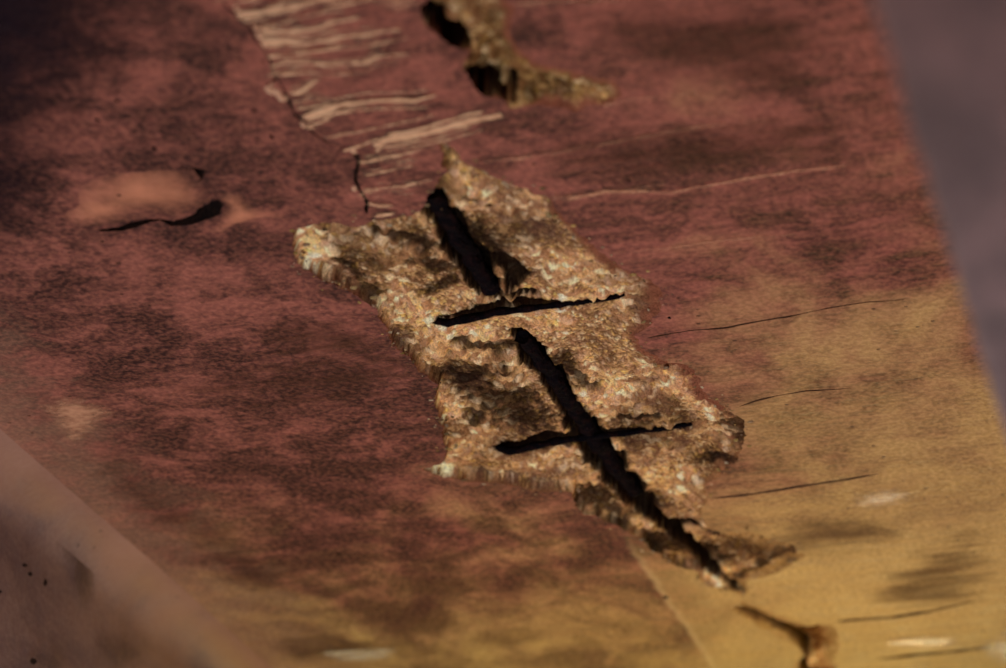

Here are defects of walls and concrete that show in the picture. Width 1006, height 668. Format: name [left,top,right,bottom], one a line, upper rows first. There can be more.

spalling [420,0,622,112]
peeling [208,191,285,233]
crack [649,298,909,338]
spalling [289,140,812,600]
crack [739,388,851,407]
crack [712,474,878,499]
crack [731,600,973,668]